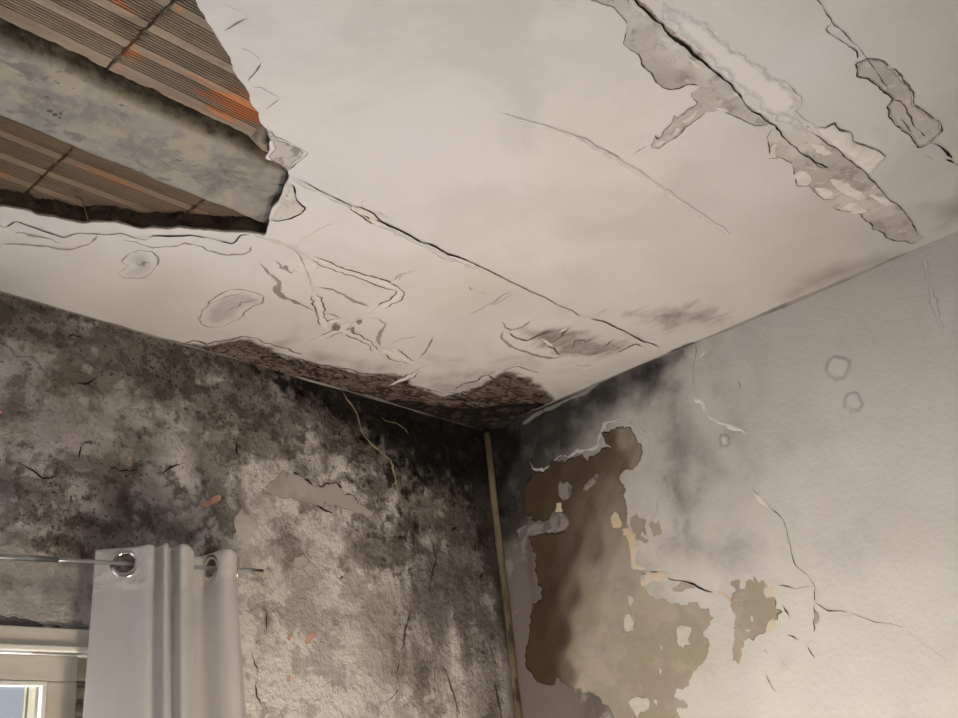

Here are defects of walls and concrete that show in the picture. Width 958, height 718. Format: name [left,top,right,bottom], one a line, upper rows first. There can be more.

crack [817,0,893,100]
crack [0,221,249,244]
flaking render [0,87,306,235]
water stain [120,240,252,279]
water stain [259,260,314,311]
crack [245,49,658,347]
peeling [591,0,924,244]
water stain [501,321,641,366]
water stain [171,336,693,718]
peeling [517,426,713,718]
crack [644,571,711,592]
peeling [717,576,790,664]